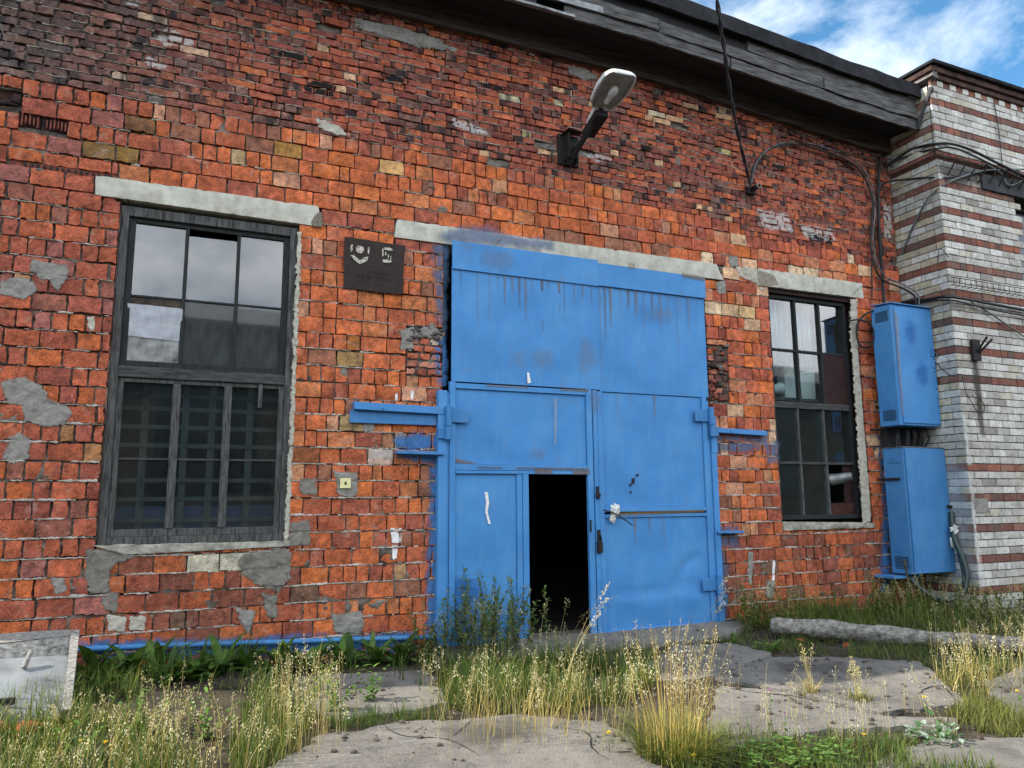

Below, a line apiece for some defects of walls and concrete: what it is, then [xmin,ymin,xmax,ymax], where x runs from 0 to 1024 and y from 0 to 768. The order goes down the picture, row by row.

spalling [406,324,445,341]